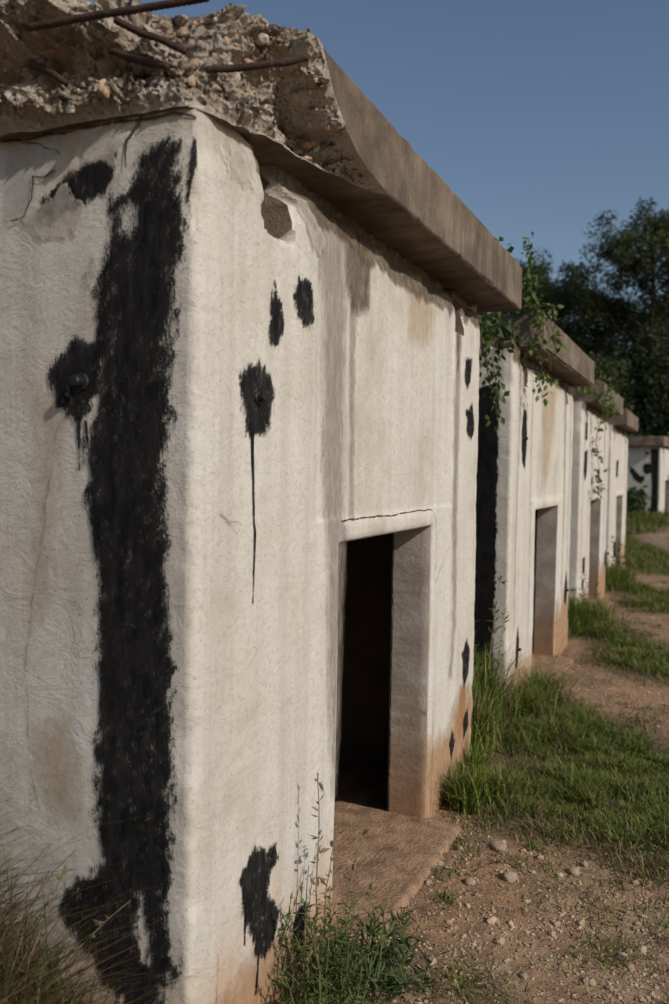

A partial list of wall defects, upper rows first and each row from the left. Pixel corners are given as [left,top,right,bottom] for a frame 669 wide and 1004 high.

spalling [26,0,210,55]
spalling [107,47,170,70]
spalling [206,53,309,74]
crack [5,111,196,222]